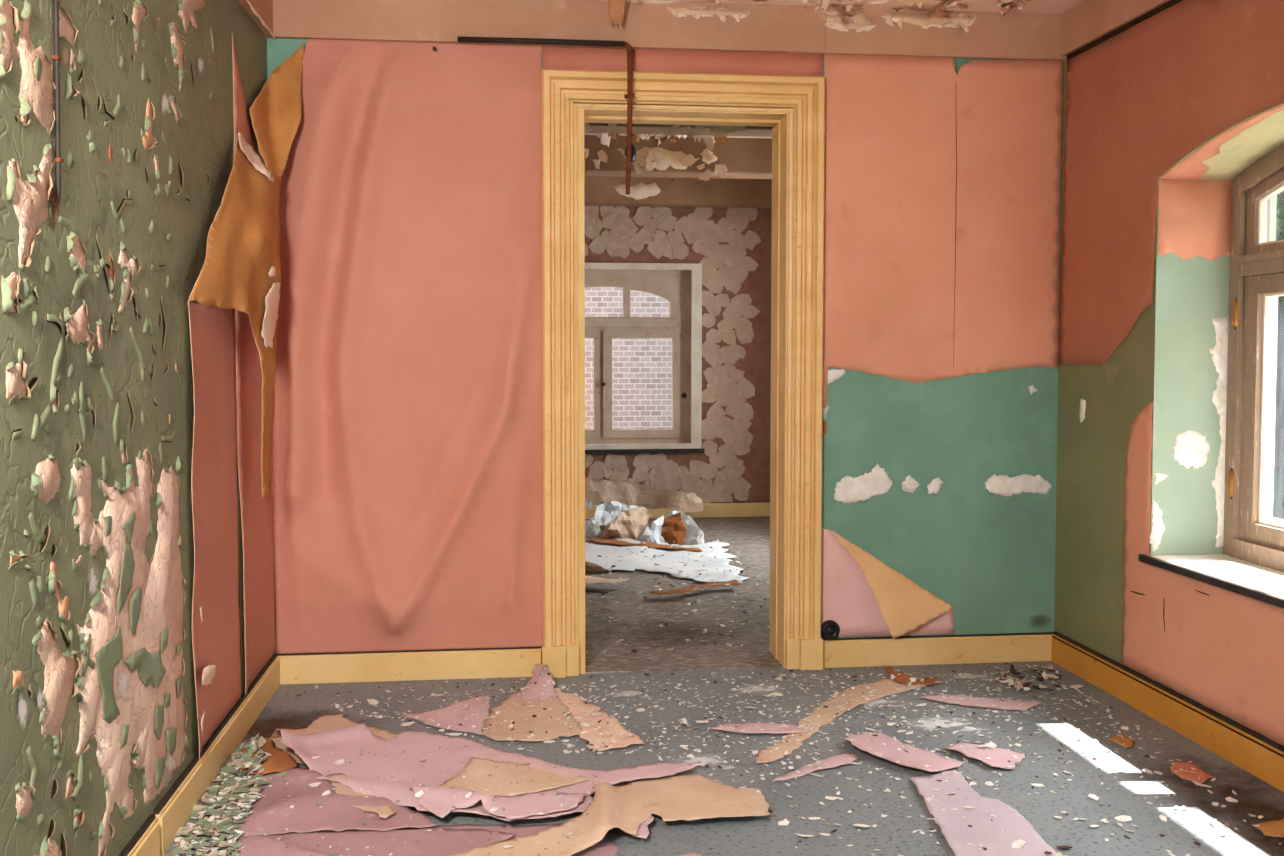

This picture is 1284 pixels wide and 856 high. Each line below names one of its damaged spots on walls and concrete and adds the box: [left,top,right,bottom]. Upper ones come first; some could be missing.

peeling [802,0,978,33]
peeling [169,0,206,123]
peeling [0,0,81,317]
peeling [141,98,171,199]
peeling [64,299,104,364]
peeling [108,241,142,315]
peeling [584,123,761,503]
peeling [5,348,31,405]
spalling [834,463,943,504]
spalling [983,474,1052,497]
peeling [31,438,205,856]
peeling [15,781,36,823]